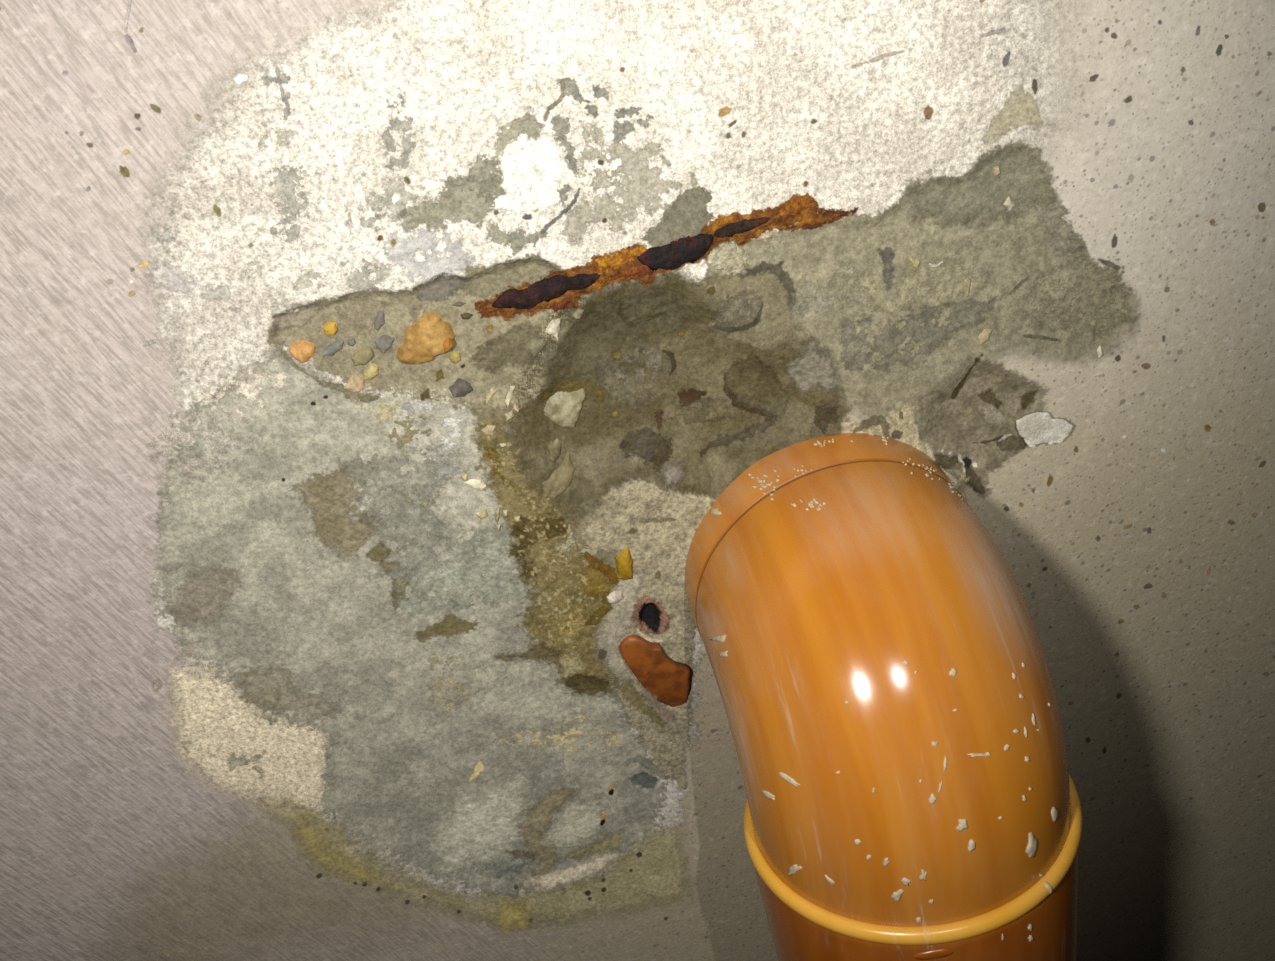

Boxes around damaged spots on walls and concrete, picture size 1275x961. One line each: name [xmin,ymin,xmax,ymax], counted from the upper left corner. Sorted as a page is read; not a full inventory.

peeling [258,73,294,150]
peeling [131,262,236,311]
rust [475,193,858,321]
spalling [265,78,1137,595]